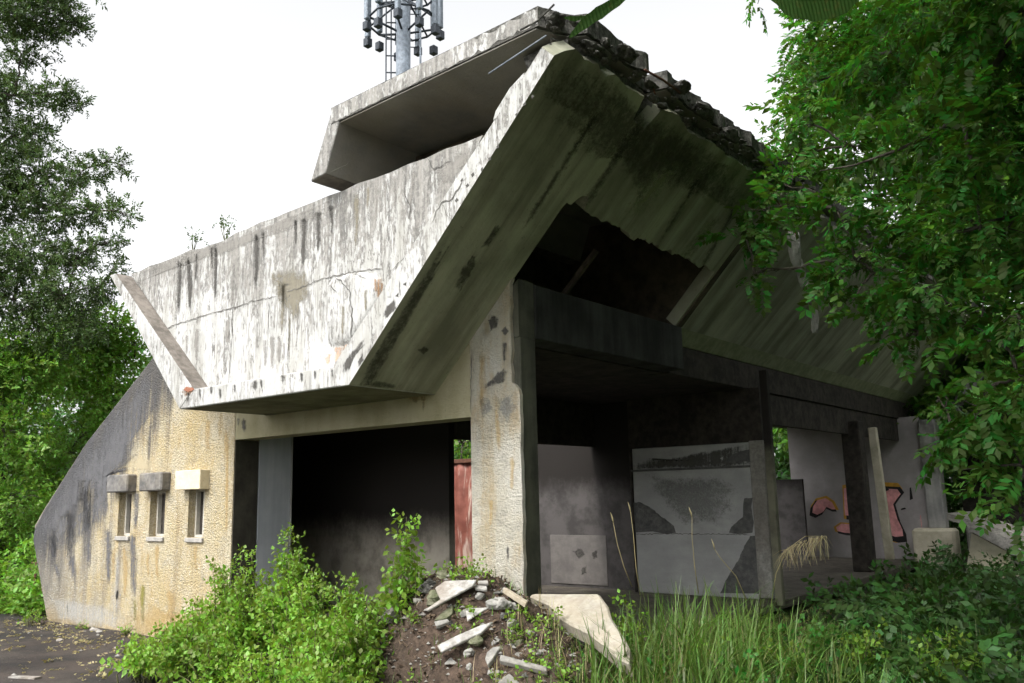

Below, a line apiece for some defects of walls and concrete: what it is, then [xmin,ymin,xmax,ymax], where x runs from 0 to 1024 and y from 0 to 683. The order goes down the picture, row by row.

damp [354,179,396,243]
crack [402,158,468,236]
damp [528,76,733,262]
spalling [488,4,844,231]
damp [145,201,333,364]
crack [167,258,404,370]
damp [481,316,515,415]
damp [43,377,157,581]
damp [130,493,139,619]